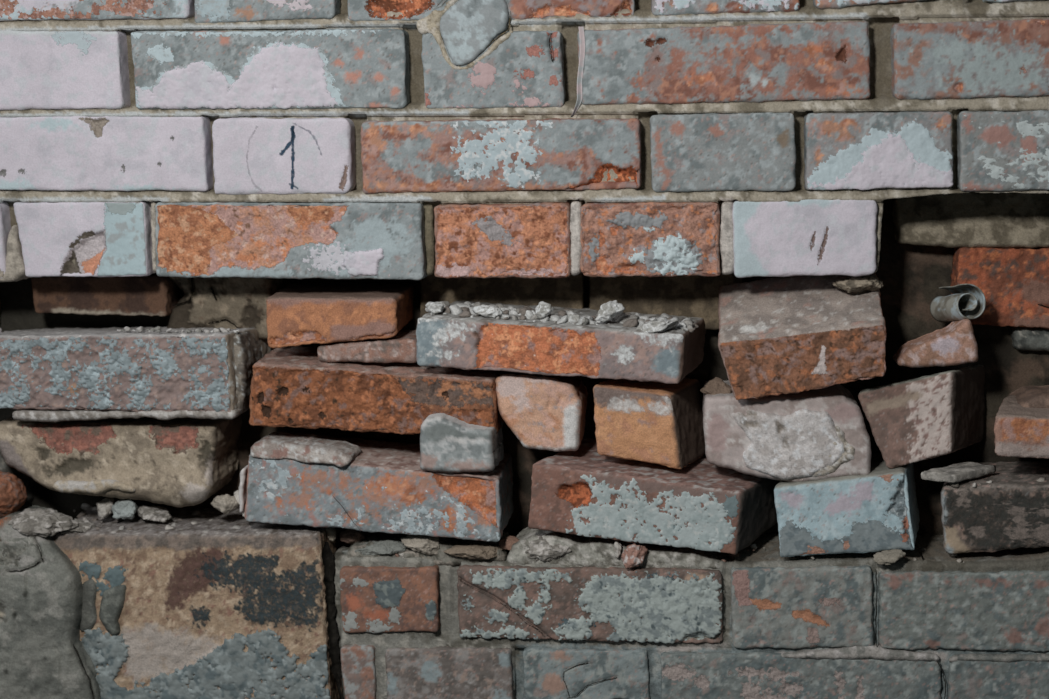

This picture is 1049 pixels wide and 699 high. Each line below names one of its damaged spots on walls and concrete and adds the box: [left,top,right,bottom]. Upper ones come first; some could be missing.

peeling [131,0,435,109]
peeling [450,120,553,190]
peeling [807,118,967,190]
spalling [60,203,390,276]
spalling [436,204,719,278]
spalling [250,323,601,434]
spalling [720,325,885,400]
spalling [381,473,500,541]
peeling [555,474,740,554]
peeling [779,474,913,557]
peeling [460,568,840,647]
peeling [81,627,331,699]